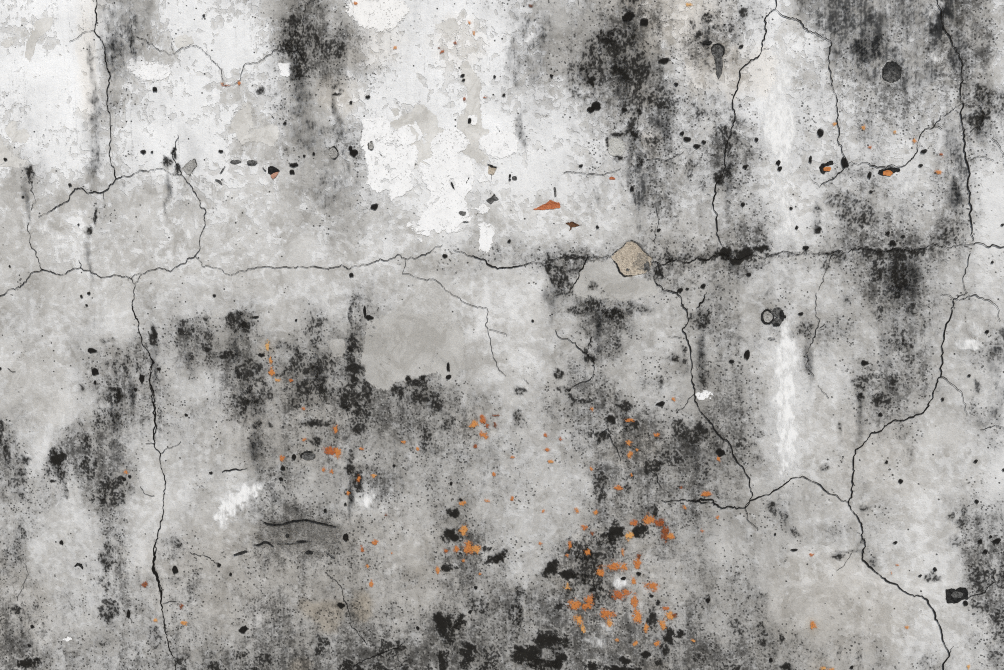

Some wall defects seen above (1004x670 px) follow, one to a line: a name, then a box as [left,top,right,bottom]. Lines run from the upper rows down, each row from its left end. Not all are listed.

spalling [215,152,315,184]
peeling [328,61,518,254]
leakage [567,20,709,210]
leakage [177,302,373,455]
crack [0,0,608,670]
peeling [567,240,661,303]
leakage [651,188,964,408]
crack [650,0,1004,670]
corrosion [444,525,481,562]
leakage [425,598,573,670]
corrosion [563,583,616,633]
corrosion [597,515,678,633]